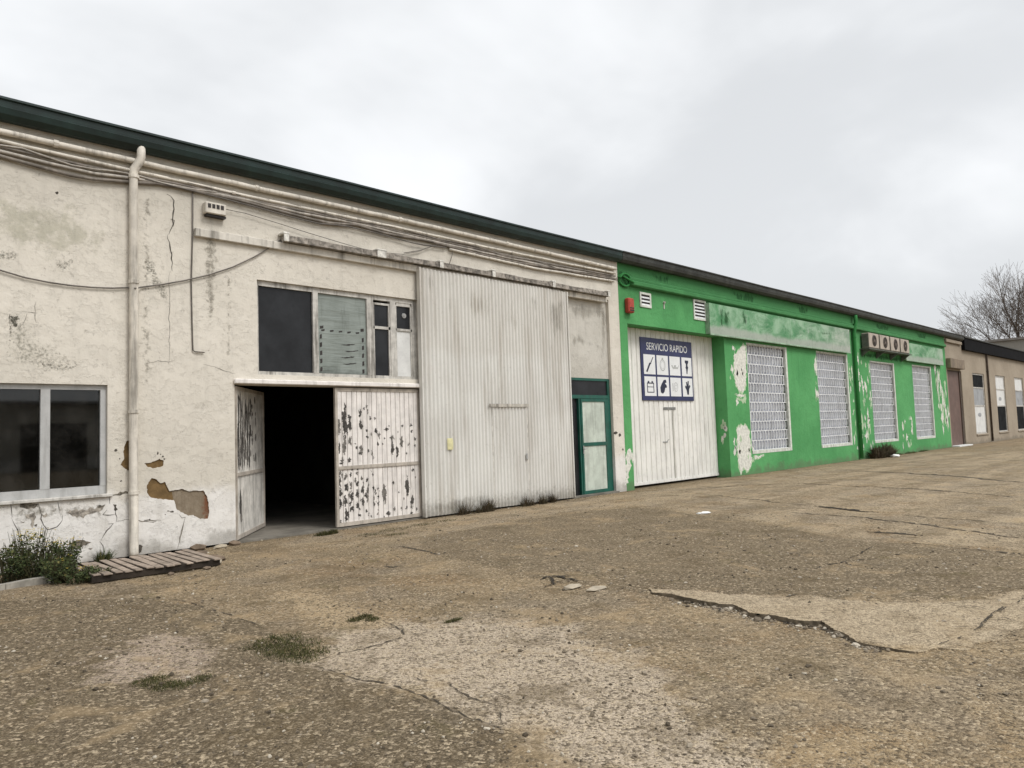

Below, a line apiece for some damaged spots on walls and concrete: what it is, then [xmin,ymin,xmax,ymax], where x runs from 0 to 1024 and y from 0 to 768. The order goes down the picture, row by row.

crack [152,194,175,363]
crack [11,504,63,531]
peeling [67,440,129,518]
spalling [144,452,209,519]
peeling [237,394,256,471]
peeling [338,403,417,523]
peeling [730,343,747,406]
peeling [721,420,764,475]
peeling [849,356,873,451]
peeling [934,365,949,434]
crack [943,598,1024,643]